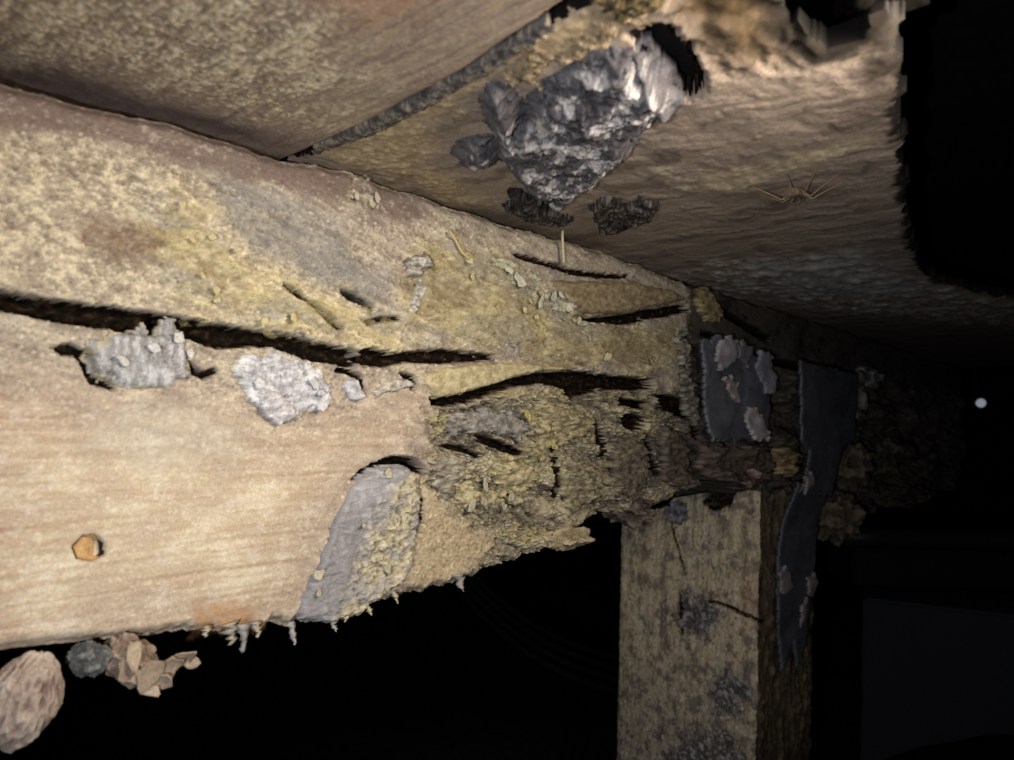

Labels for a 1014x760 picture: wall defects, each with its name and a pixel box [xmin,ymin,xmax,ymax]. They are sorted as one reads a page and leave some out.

crack [513,254,627,279]
crack [581,286,798,371]
crack [0,285,701,475]
peeling [468,476,489,513]
crack [549,447,561,497]